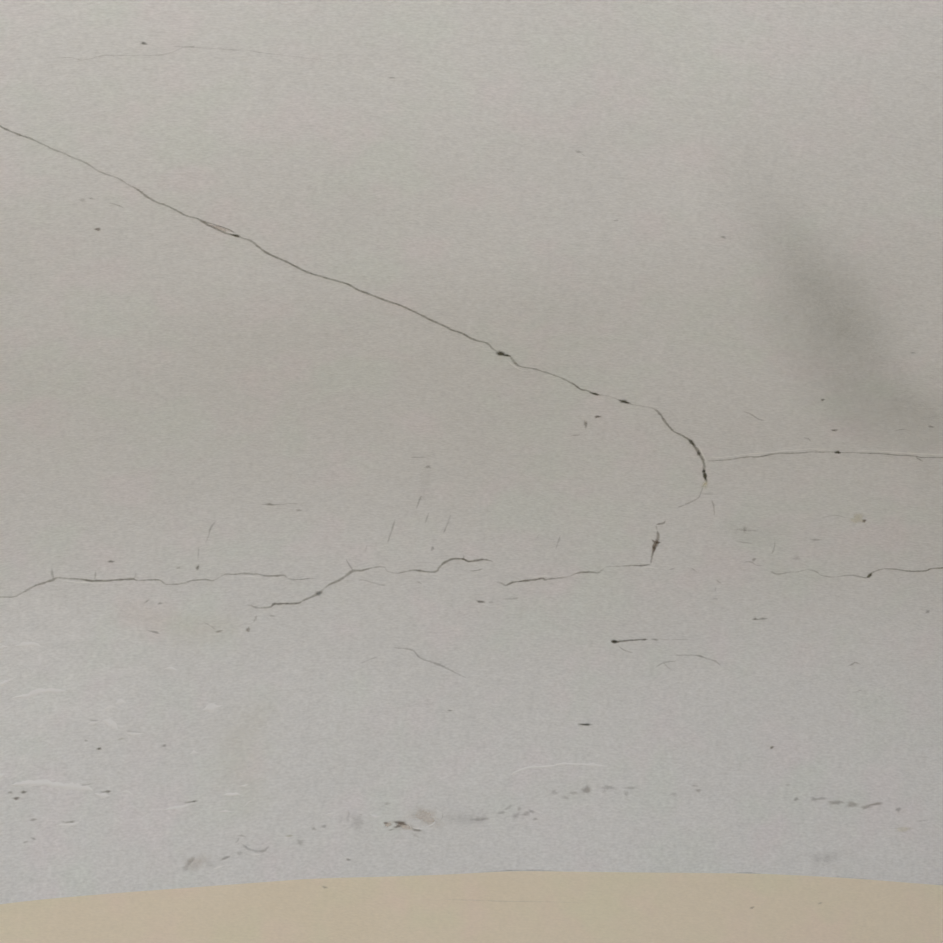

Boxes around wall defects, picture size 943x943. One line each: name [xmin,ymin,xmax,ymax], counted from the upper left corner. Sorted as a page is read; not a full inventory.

crack [685,437,943,480]